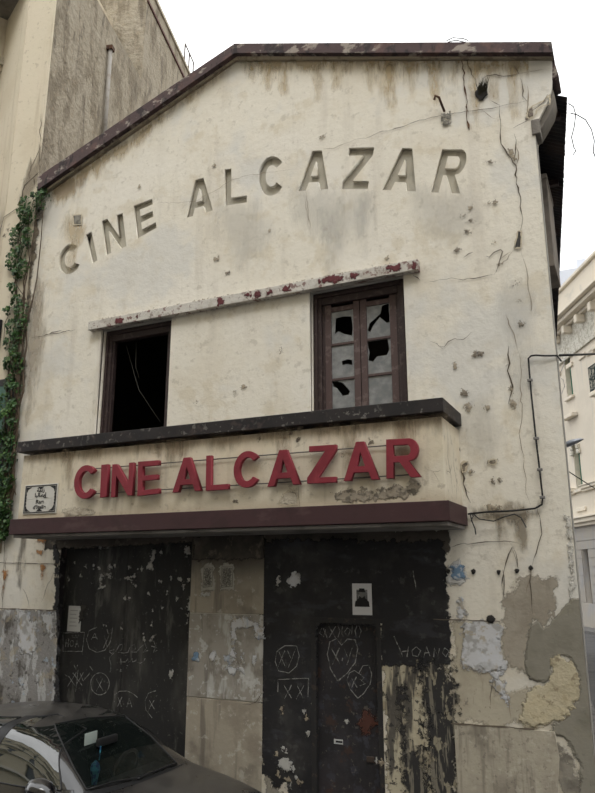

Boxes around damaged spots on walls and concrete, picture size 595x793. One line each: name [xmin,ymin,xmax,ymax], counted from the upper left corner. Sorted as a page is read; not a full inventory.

crack [318,60,547,227]
peeling [244,270,359,298]
peeling [375,256,401,272]
crack [413,249,532,311]
spalling [330,479,421,503]
crack [427,437,470,501]
crack [453,316,542,614]
peeling [264,746,304,793]